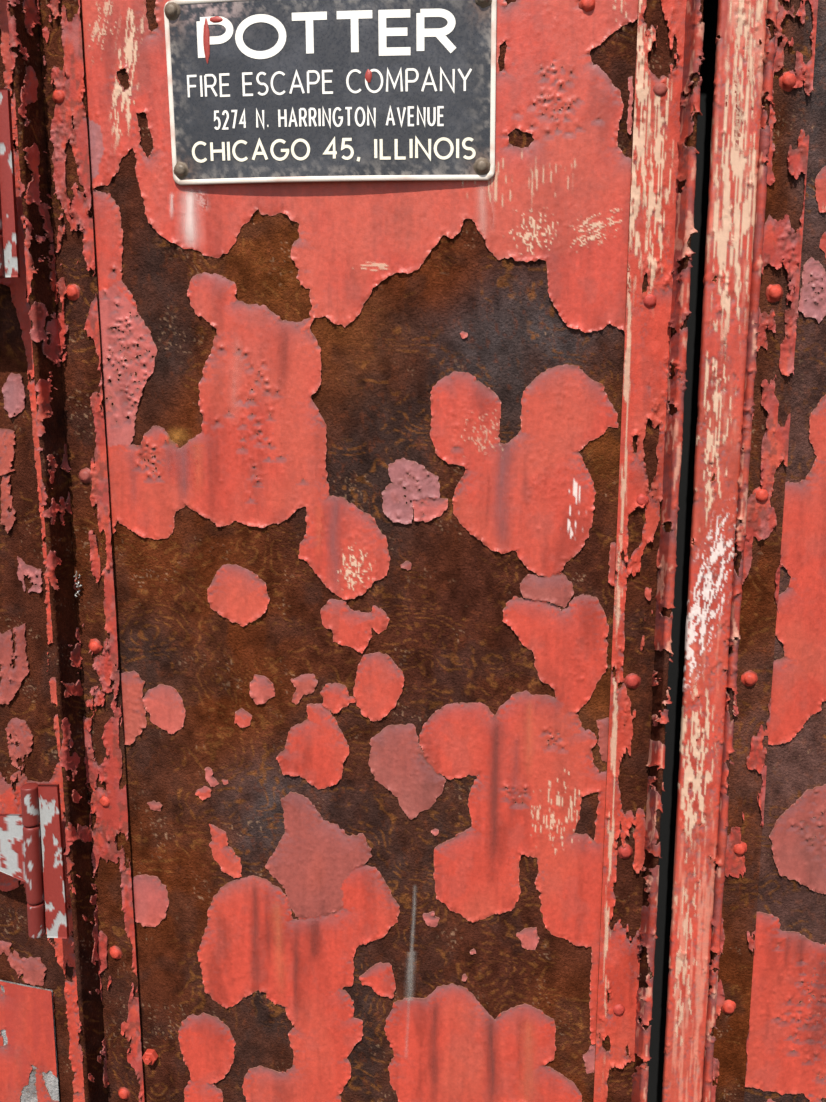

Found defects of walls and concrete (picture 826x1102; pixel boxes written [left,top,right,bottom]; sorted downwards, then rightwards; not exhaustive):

peeling [137,112,153,157]
peeling [636,0,679,79]
peeling [759,0,812,233]
rust [786,0,826,483]
rust [0,284,60,796]
peeling [6,0,145,1102]
rust [95,148,624,1102]
peeling [609,419,672,988]
peeling [709,259,798,1102]
rust [757,701,826,944]
peeling [606,1045,648,1102]
rust [744,1087,826,1102]